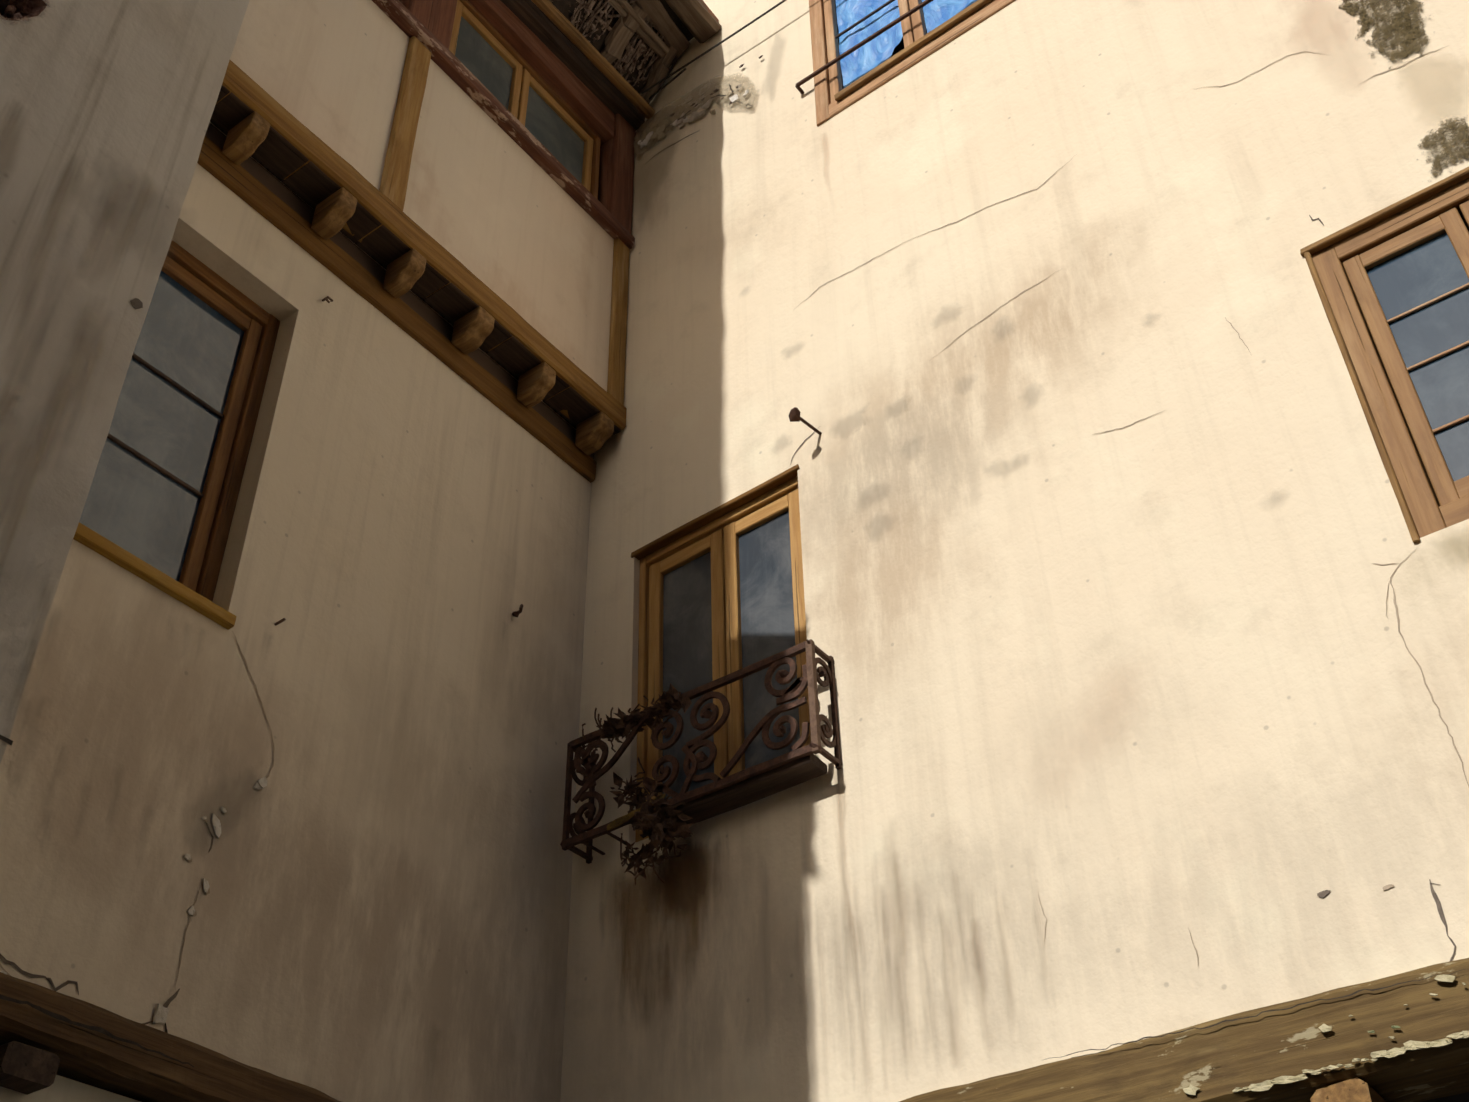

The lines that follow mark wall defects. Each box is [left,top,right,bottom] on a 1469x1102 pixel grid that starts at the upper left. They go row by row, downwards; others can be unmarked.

spalling [633,55,763,165]
crack [0,735,13,746]
crack [232,631,275,789]
crack [1372,548,1469,786]
crack [0,884,202,1067]
peeling [1429,974,1466,996]
peeling [1183,1084,1200,1095]
peeling [1232,1026,1469,1092]